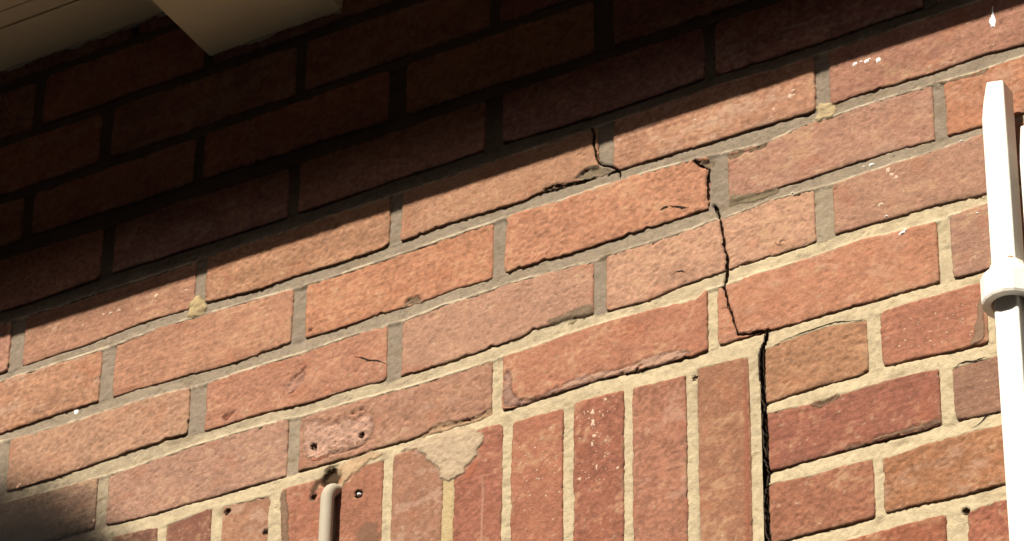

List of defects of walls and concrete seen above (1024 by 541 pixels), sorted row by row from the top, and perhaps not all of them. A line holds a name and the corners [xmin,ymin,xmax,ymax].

crack [661,160,863,541]